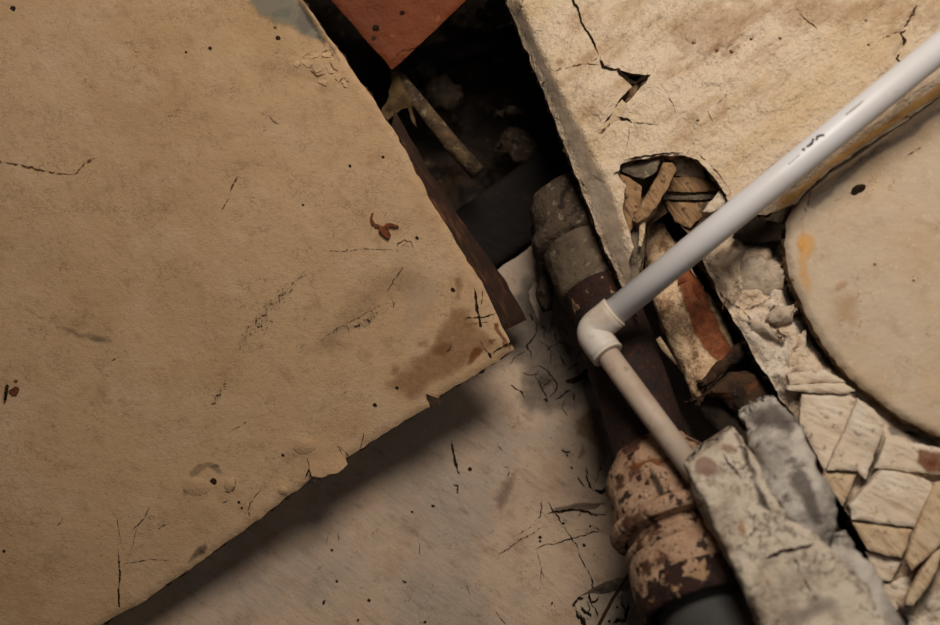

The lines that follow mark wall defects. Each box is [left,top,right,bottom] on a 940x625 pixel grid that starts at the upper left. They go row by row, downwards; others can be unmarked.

crack [541,0,650,85]
crack [0,159,91,175]
hole [614,149,731,196]
spalling [672,218,688,239]
spalling [694,264,741,345]
crack [465,288,592,415]
spalling [737,354,772,394]
rust [632,459,669,496]
crack [114,508,167,607]
crack [537,450,606,583]
spalling [835,503,866,559]